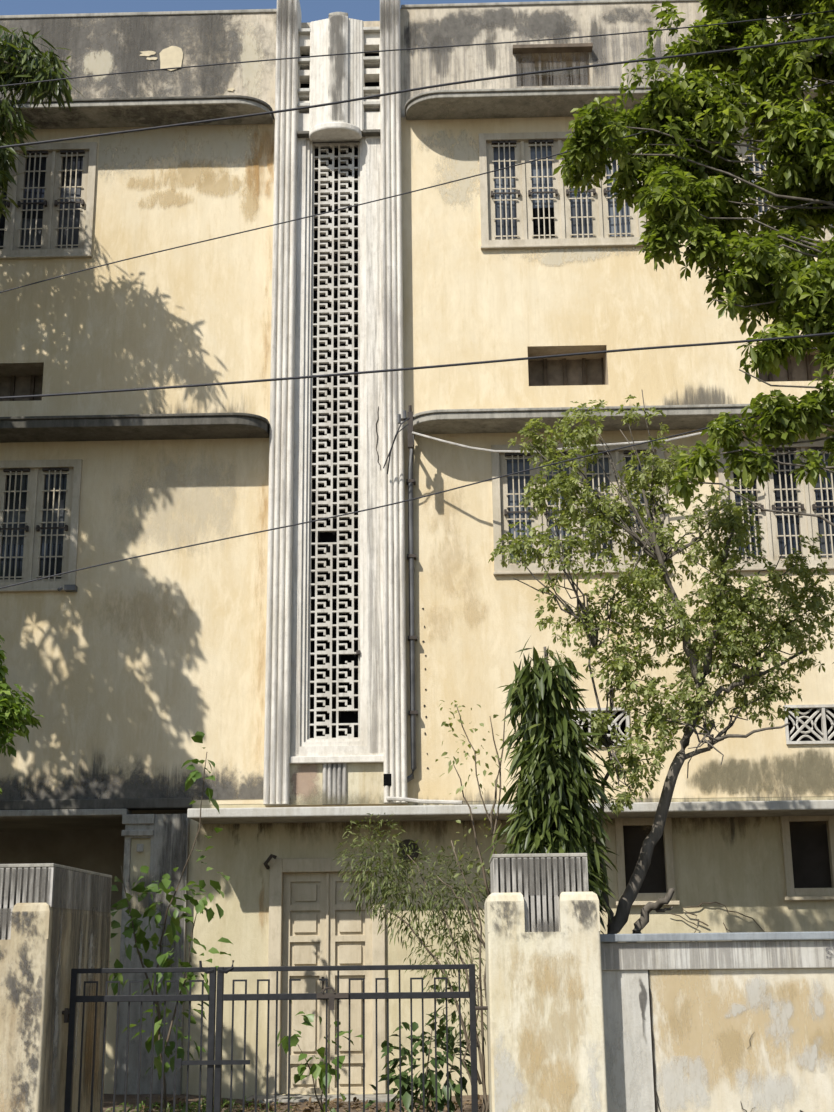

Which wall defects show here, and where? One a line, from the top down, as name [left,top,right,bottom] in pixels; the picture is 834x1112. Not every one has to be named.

peeling [84,51,112,80]
damp [0,14,244,128]
peeling [140,46,183,71]
damp [380,2,576,74]
damp [590,8,649,73]
damp [665,388,729,405]
damp [0,759,264,800]
damp [684,750,834,802]
damp [127,814,187,968]
damp [494,858,597,924]
damp [524,923,559,937]
damp [0,867,112,1112]